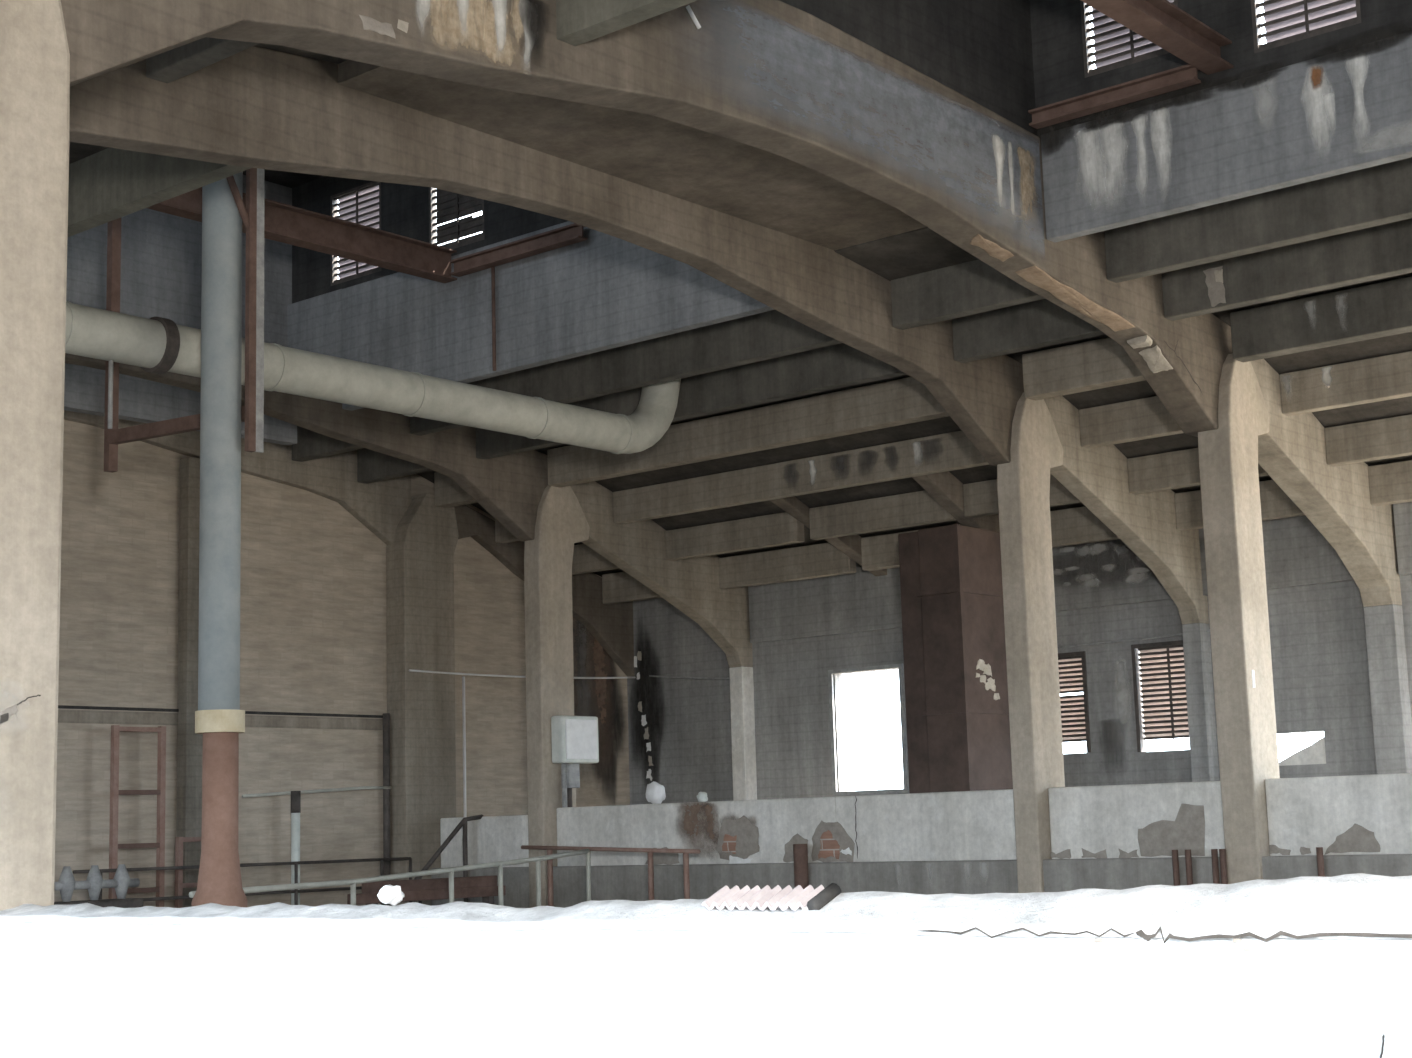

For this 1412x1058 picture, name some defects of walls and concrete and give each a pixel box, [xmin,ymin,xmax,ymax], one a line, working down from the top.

leakage [1305,67,1334,141]
leakage [1350,55,1366,129]
leakage [1080,108,1169,191]
spalling [0,704,18,724]
peeling [717,816,760,864]
peeling [783,820,855,863]
peeling [1050,803,1205,859]
peeling [1269,824,1381,855]